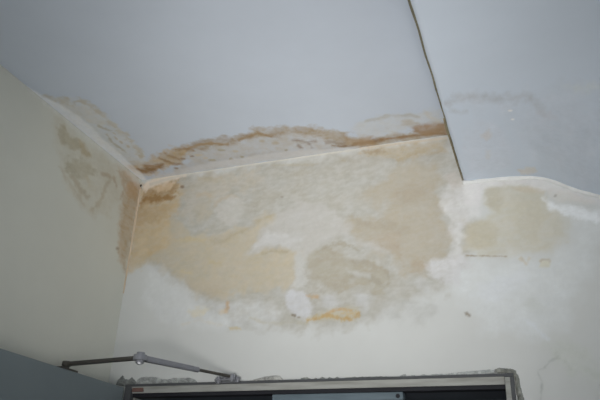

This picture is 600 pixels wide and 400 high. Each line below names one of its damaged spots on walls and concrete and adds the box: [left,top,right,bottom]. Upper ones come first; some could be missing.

leakage [42,71,600,343]